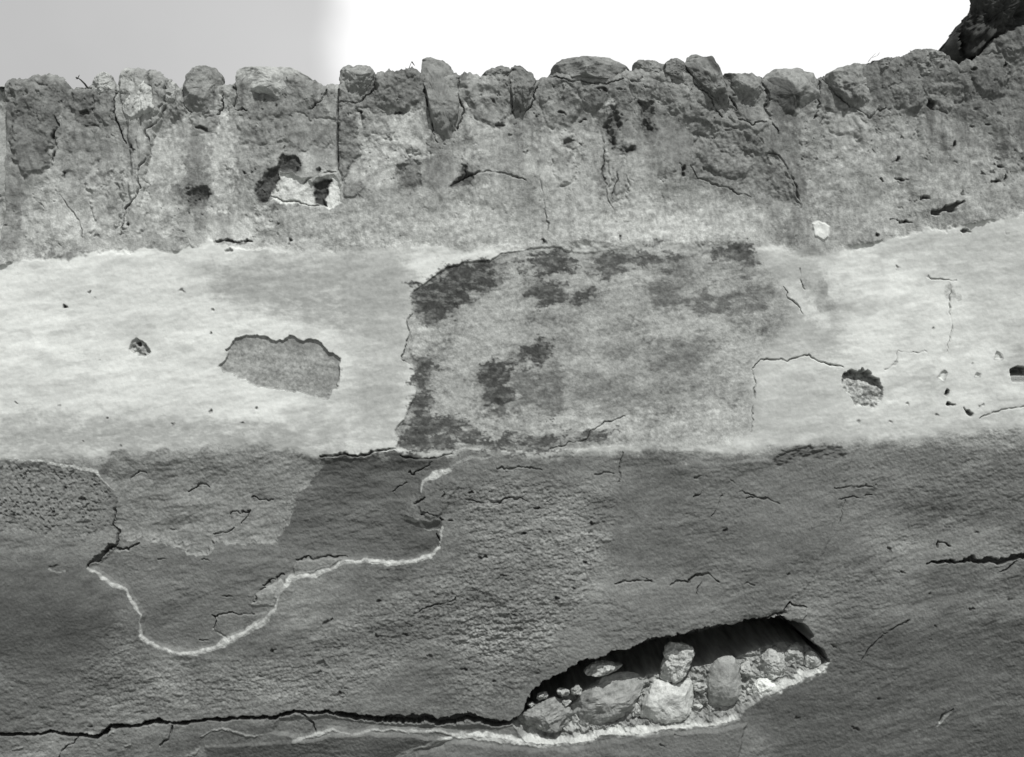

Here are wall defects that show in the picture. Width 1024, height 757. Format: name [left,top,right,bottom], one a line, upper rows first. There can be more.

spalling [243,83,372,210]
damp [194,238,682,348]
damp [633,238,777,382]
crack [320,448,397,457]
peeling [0,235,848,657]
damp [343,334,658,466]
crack [419,597,457,613]
crack [926,540,1024,573]
crack [0,710,511,757]
spalling [186,601,838,757]